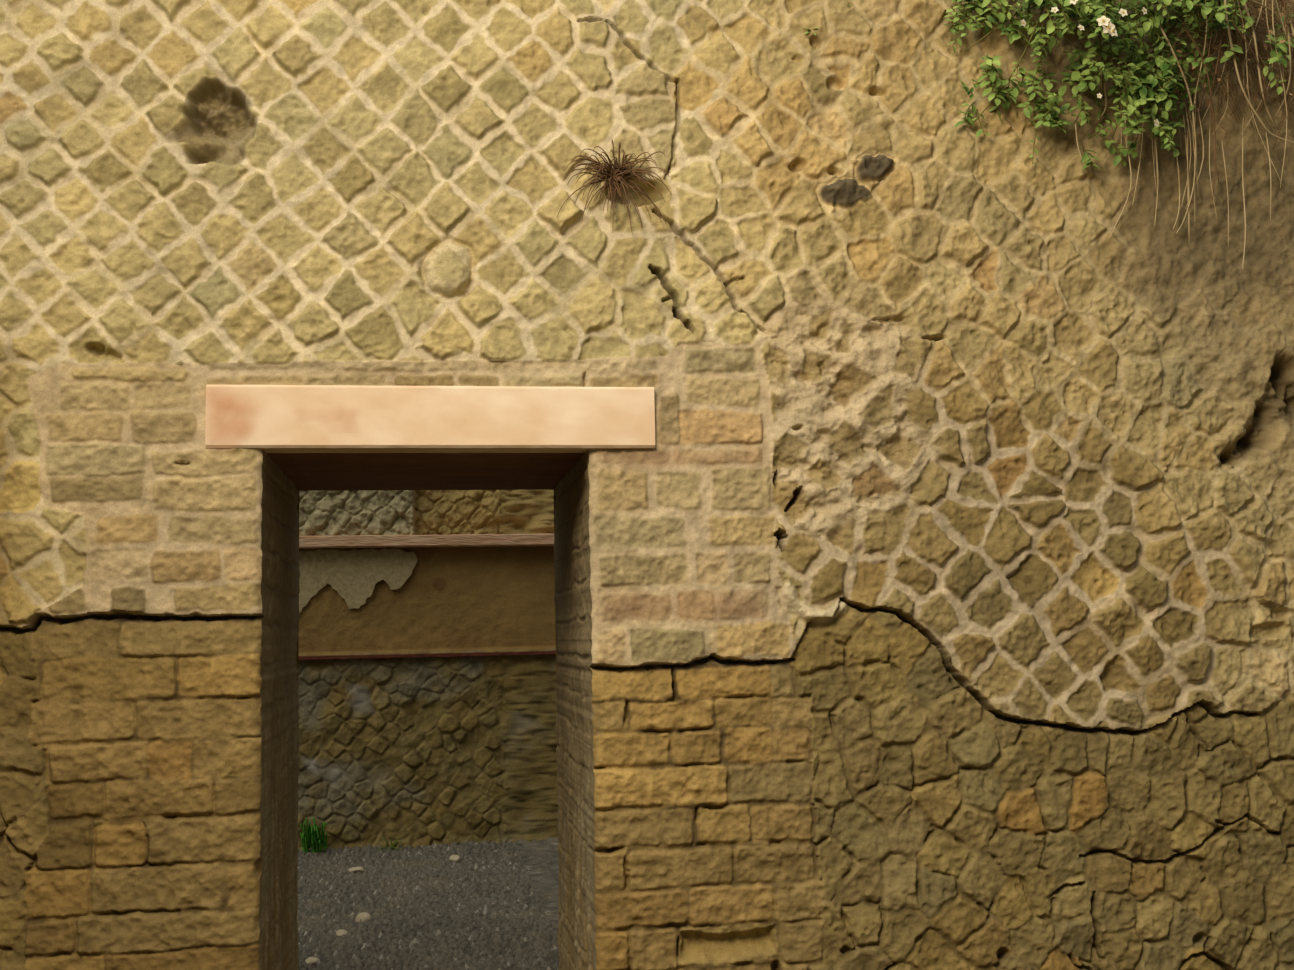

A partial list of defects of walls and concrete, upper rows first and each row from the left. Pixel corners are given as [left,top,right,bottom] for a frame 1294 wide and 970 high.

crack [577,14,767,334]
spalling [1214,350,1294,472]
crack [0,608,264,636]
flaking render [299,548,418,613]
crack [590,652,796,700]
crack [839,596,1262,750]
crack [1050,811,1284,970]
crack [883,962,898,970]